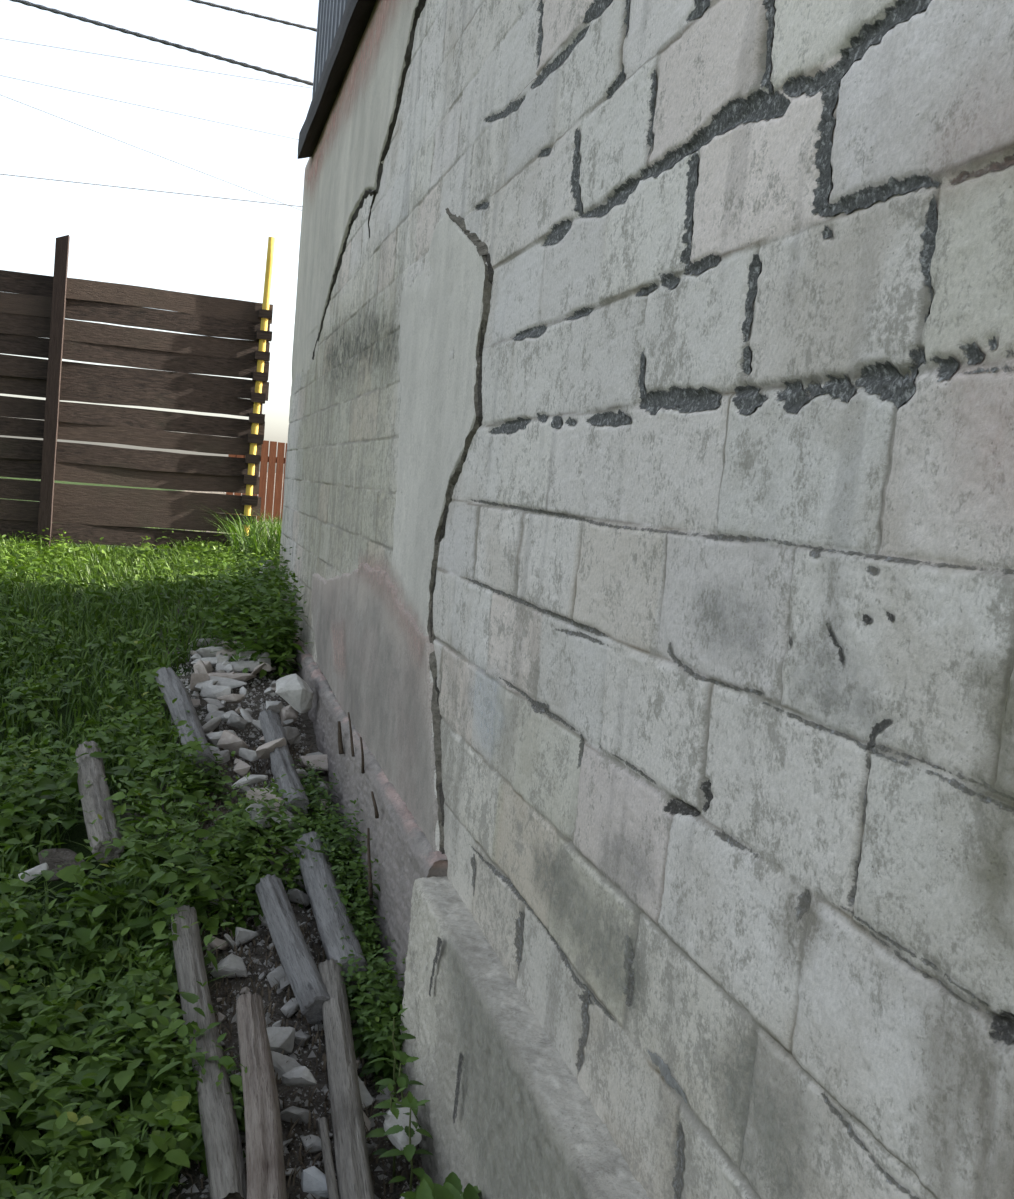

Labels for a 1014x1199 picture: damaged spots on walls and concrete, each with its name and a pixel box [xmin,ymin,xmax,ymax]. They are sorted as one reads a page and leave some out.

spalling [485,0,630,122]
crack [312,0,426,360]
spalling [543,0,939,322]
spalling [490,254,1014,434]
crack [427,240,1014,1073]
crack [453,1052,464,1123]
crack [821,1093,919,1199]
spalling [989,1012,1014,1045]